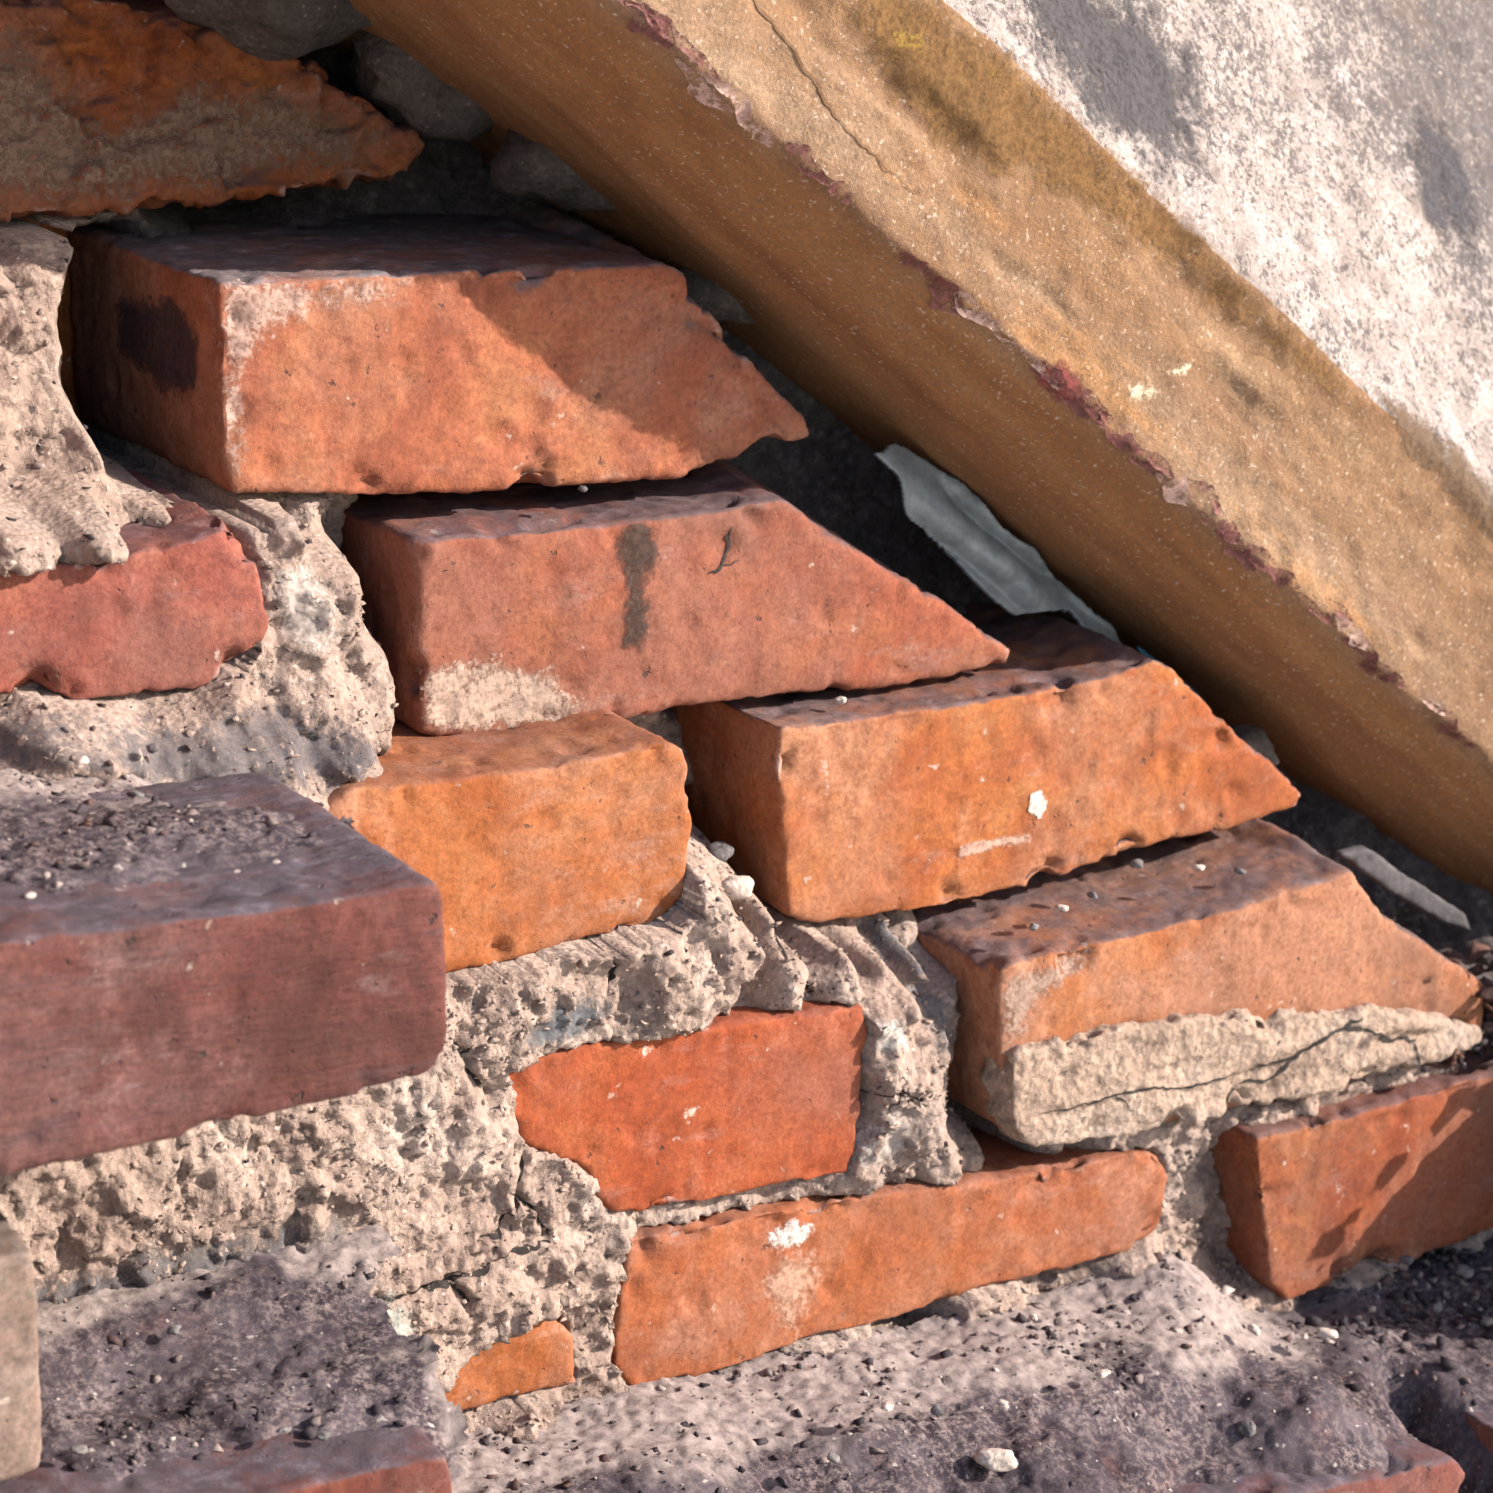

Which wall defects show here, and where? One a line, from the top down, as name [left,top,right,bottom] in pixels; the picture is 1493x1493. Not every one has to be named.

peeling [617,0,853,205]
crack [754,0,922,193]
leakage [852,0,1349,403]
leakage [1404,103,1484,264]
peeling [898,252,1478,749]
crack [1039,1018,1425,1115]